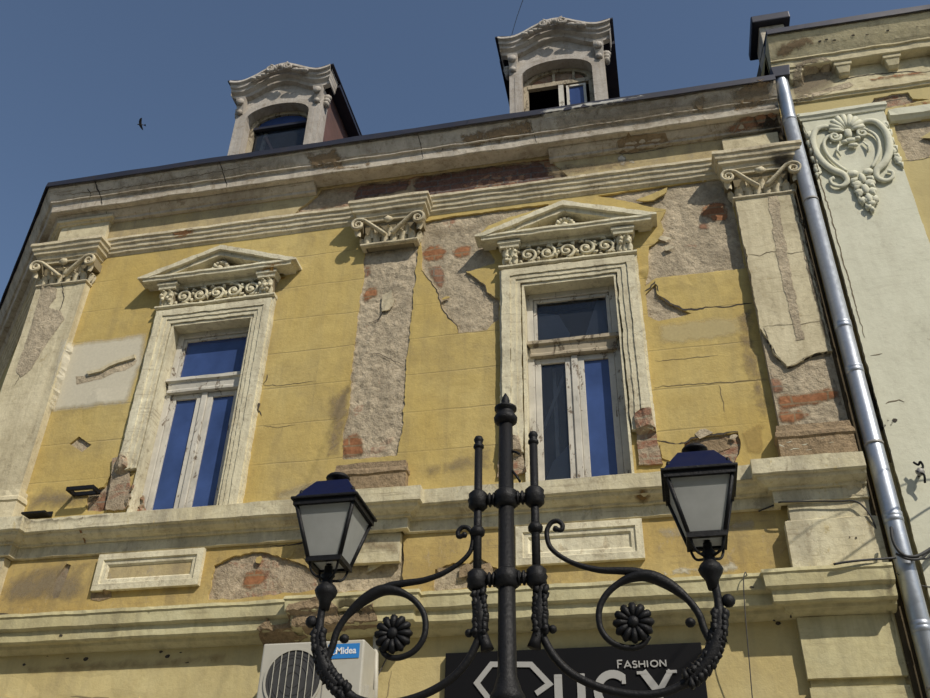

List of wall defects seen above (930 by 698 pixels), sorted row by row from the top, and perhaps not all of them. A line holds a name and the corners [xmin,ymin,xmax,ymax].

crack [66,160,250,214]
spalling [298,159,567,213]
peeling [16,284,64,377]
peeling [53,336,143,410]
spalling [328,206,546,460]
spalling [604,180,745,321]
crack [645,282,750,311]
peeling [768,195,805,340]
crack [764,320,829,369]
spalling [761,332,848,426]
spalling [685,426,762,462]
spalling [87,454,146,512]